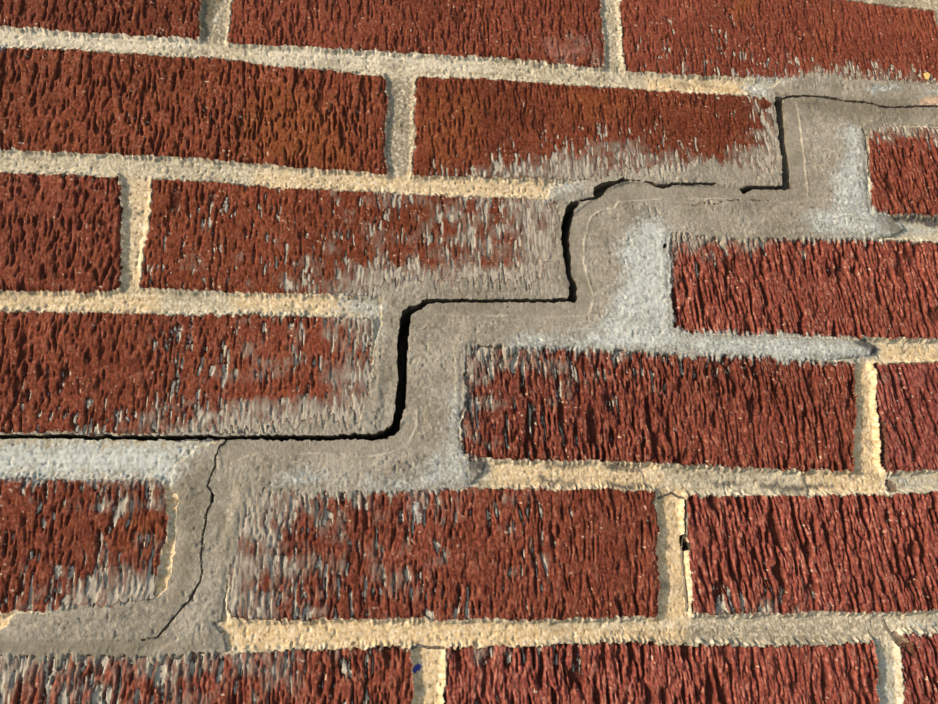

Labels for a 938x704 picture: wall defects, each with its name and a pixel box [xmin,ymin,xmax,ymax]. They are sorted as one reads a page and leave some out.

leakage [510,216,877,363]
crack [0,95,938,642]
leakage [369,377,484,540]
leakage [0,439,201,610]
leakage [228,472,368,621]
leakage [364,566,436,619]
leakage [453,587,481,619]
leakage [508,548,561,591]
crack [881,617,901,647]
leakage [0,652,251,704]
leakage [340,657,352,678]
leakage [343,648,384,704]